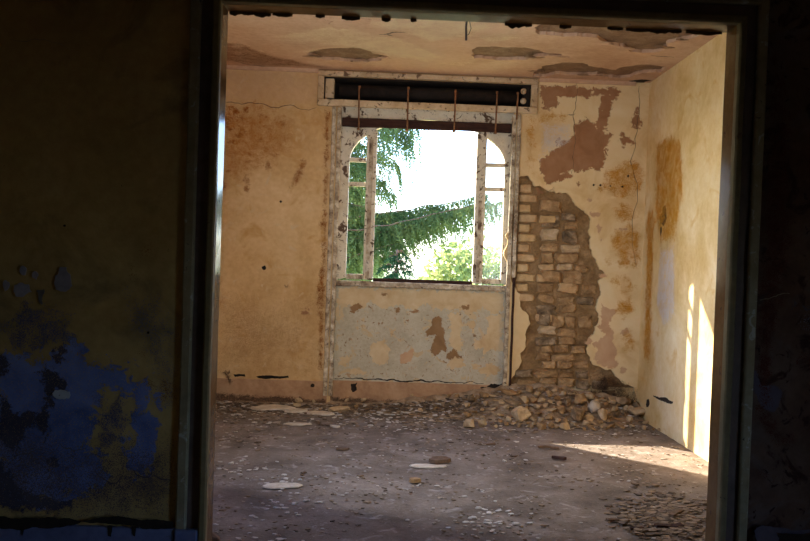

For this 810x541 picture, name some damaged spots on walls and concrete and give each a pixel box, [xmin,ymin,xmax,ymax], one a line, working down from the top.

flaking render [229,12,722,396]
water stain [598,134,684,351]
flaking render [0,516,173,537]